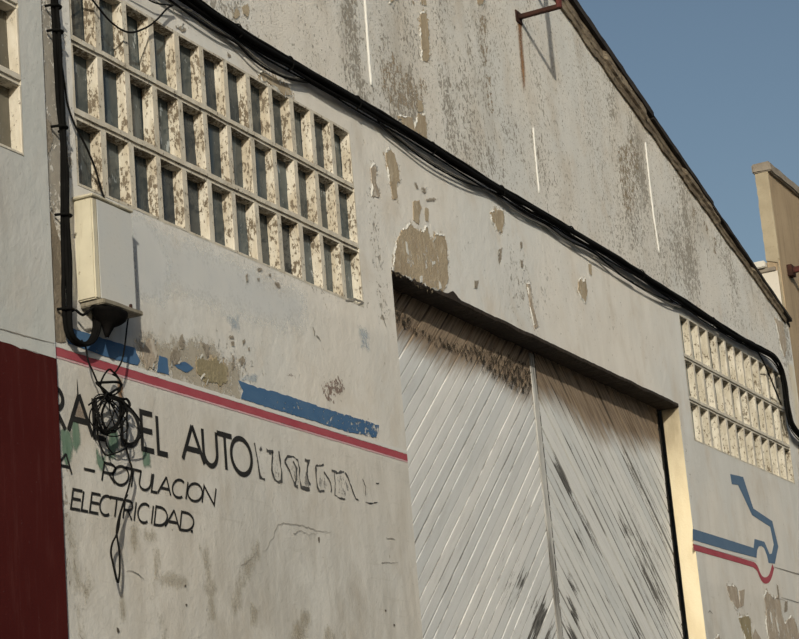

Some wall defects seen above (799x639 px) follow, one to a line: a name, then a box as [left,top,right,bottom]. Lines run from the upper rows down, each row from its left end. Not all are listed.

peeling [418,0,432,63]
peeling [369,146,402,208]
peeling [391,182,451,292]
peeling [490,206,505,235]
peeling [195,335,250,389]
water stain [394,304,532,395]
crack [242,523,329,565]
peeling [726,584,799,639]